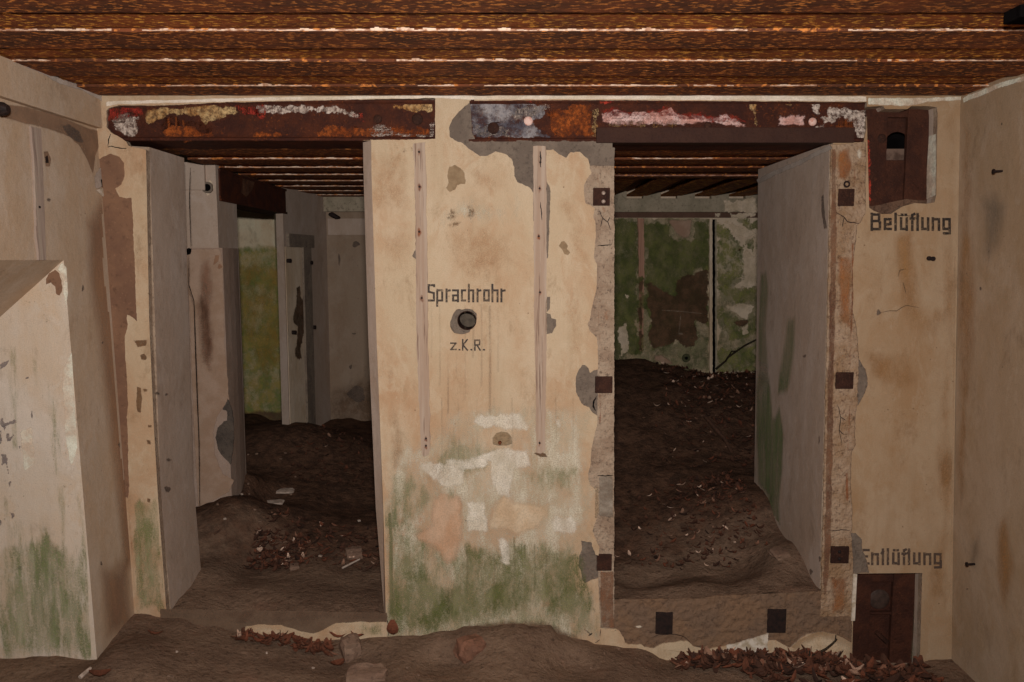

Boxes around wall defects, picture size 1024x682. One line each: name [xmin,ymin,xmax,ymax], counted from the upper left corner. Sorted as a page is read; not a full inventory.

peeling [97,154,167,498]
peeling [187,249,234,506]
spalling [446,102,927,657]